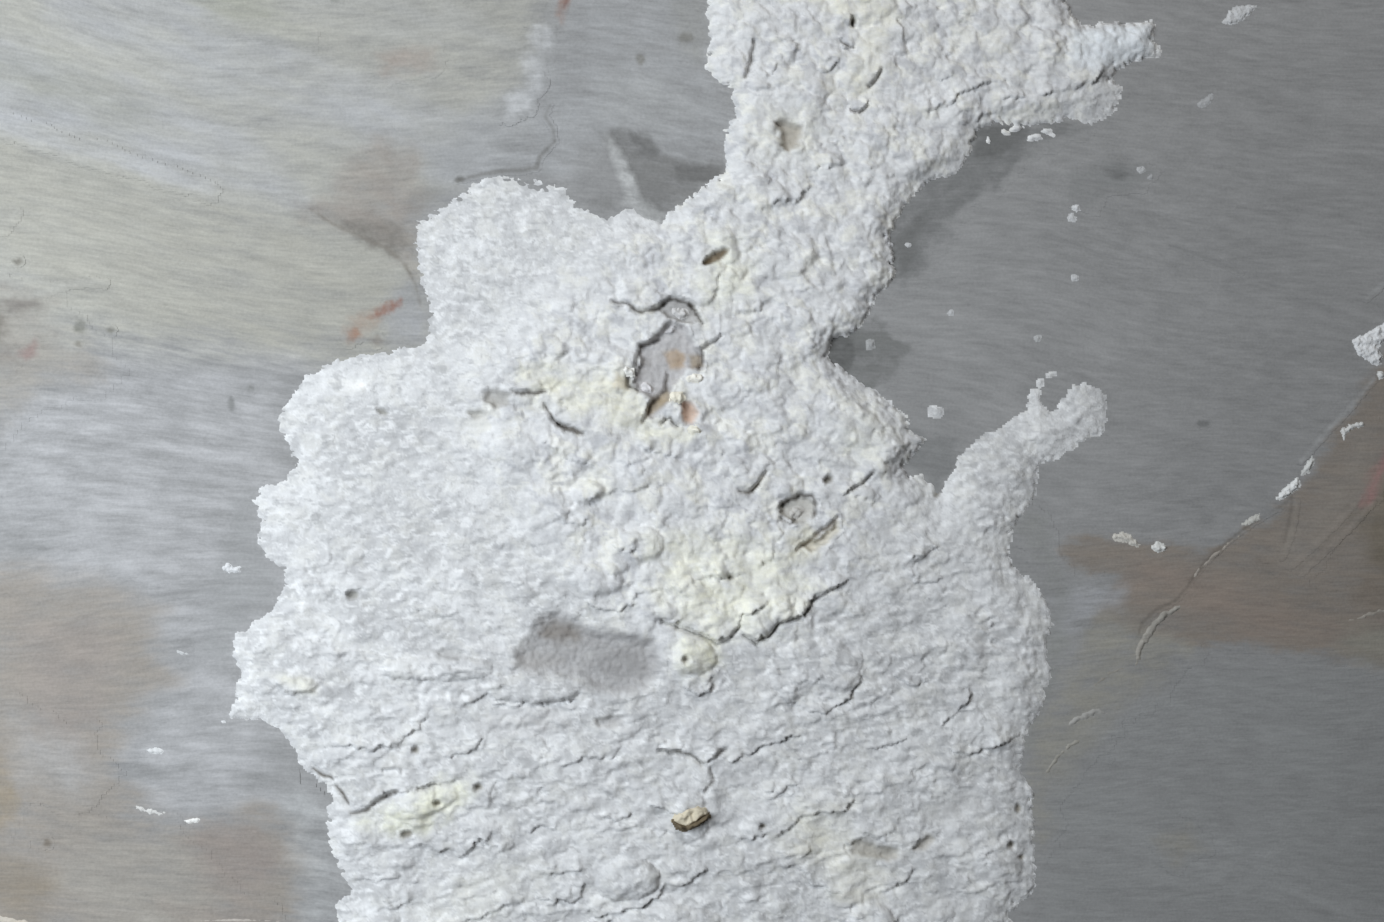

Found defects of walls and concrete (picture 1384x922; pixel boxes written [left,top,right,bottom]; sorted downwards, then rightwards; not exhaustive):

spalling [608,295,708,426]
crack [609,295,726,430]
crack [509,387,587,437]
leakage [189,0,1162,922]
crack [737,469,878,555]
crack [658,584,842,648]
leakage [1008,343,1384,922]
crack [310,765,440,817]
crack [656,746,731,796]